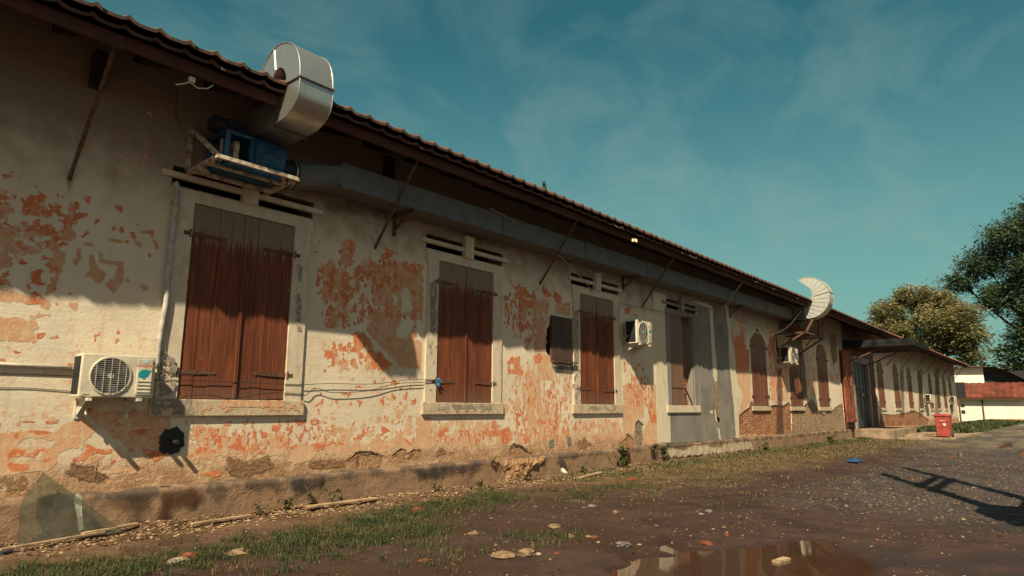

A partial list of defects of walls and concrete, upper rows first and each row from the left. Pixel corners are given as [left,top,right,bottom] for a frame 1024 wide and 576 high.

peeling [0,171,148,361]
peeling [0,223,658,482]
flaking render [732,319,845,436]